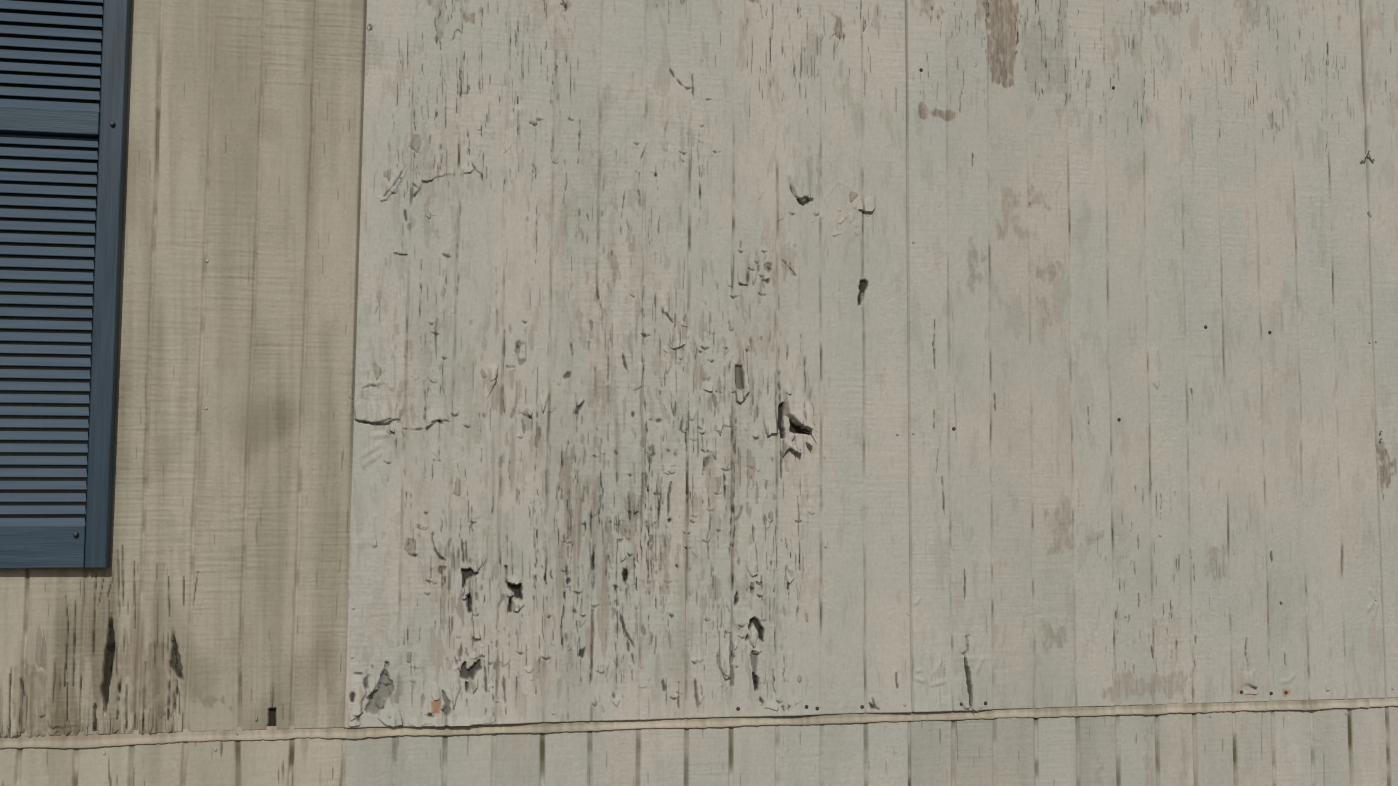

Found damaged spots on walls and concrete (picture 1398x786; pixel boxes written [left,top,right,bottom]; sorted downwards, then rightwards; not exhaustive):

peeling [377,133,474,202]
crack [367,0,712,264]
crack [655,0,986,117]
peeling [973,0,1078,105]
crack [1017,0,1346,153]
peeling [724,241,796,313]
peeling [426,315,573,462]
crack [394,241,805,722]
peeling [626,318,760,585]
crack [65,545,199,719]
peeling [670,574,767,704]
crack [1102,477,1198,678]